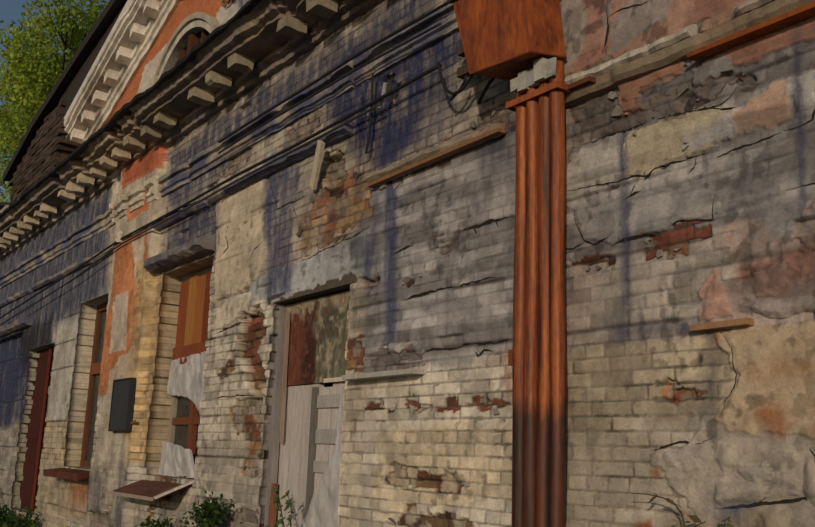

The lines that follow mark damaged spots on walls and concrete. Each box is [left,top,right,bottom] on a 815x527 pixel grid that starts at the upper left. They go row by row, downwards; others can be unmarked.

spalling [390,99,514,166]
crack [607,88,736,136]
spalling [296,157,450,250]
crack [565,109,815,250]
spalling [217,306,266,478]
spalling [365,401,396,413]
spalling [405,394,509,415]
crack [721,333,737,414]
crack [651,438,711,451]
spalling [382,462,470,493]
spalling [388,504,473,527]